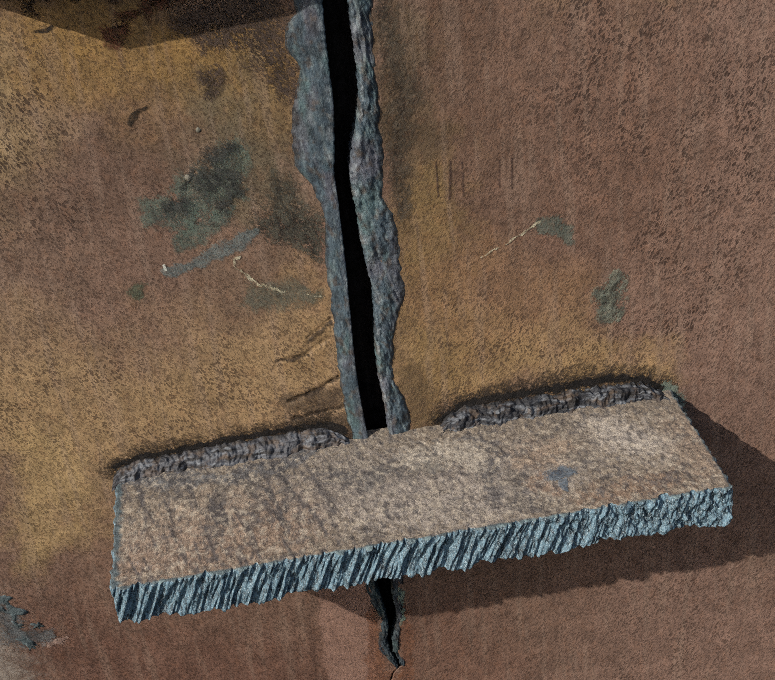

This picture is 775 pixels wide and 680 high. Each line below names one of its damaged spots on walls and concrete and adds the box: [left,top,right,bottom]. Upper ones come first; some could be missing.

crack [275,0,411,439]
crack [365,576,405,680]